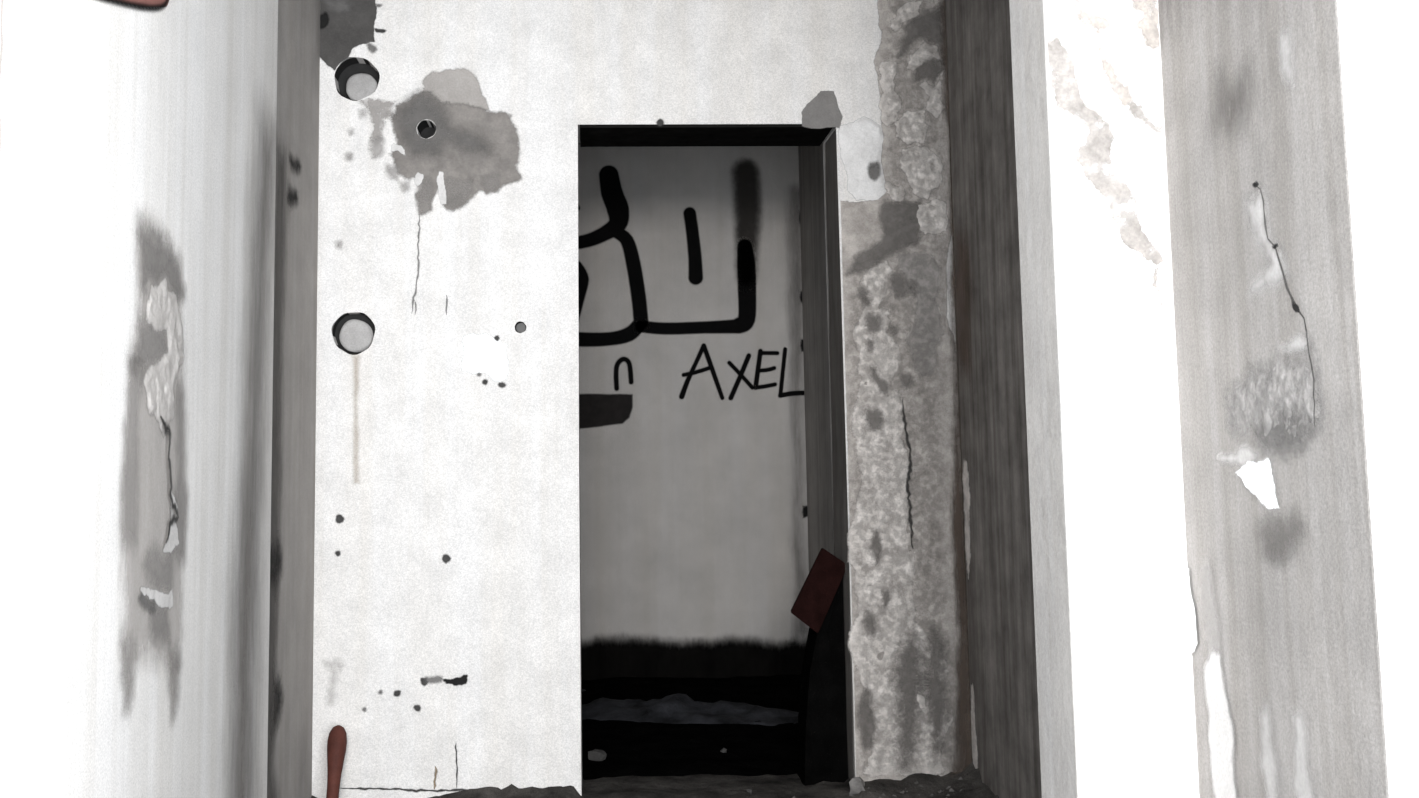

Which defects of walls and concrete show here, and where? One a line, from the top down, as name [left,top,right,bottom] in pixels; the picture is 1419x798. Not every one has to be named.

peeling [1133,0,1160,48]
water stain [391,69,521,215]
flaking render [802,91,842,129]
peeling [1048,34,1164,306]
flaking render [123,229,187,706]